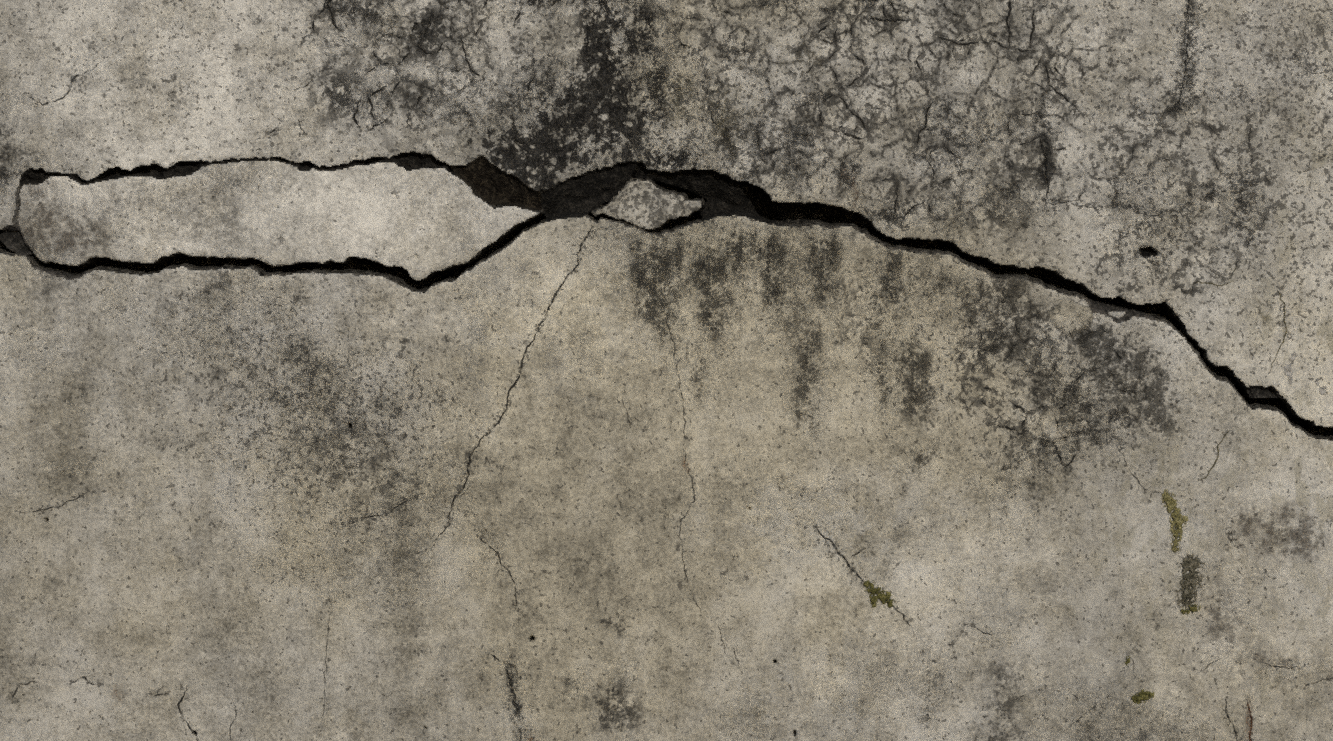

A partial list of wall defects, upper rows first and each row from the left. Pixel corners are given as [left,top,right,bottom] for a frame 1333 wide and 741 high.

leakage [324,0,378,24]
leakage [403,11,445,54]
leakage [323,76,353,114]
leakage [467,0,700,191]
crack [0,0,547,293]
crack [438,161,707,536]
leakage [630,236,784,337]
leakage [878,344,934,421]
crack [672,0,1333,493]
leakage [964,279,1054,359]
leakage [1071,331,1180,431]
crack [480,538,517,604]